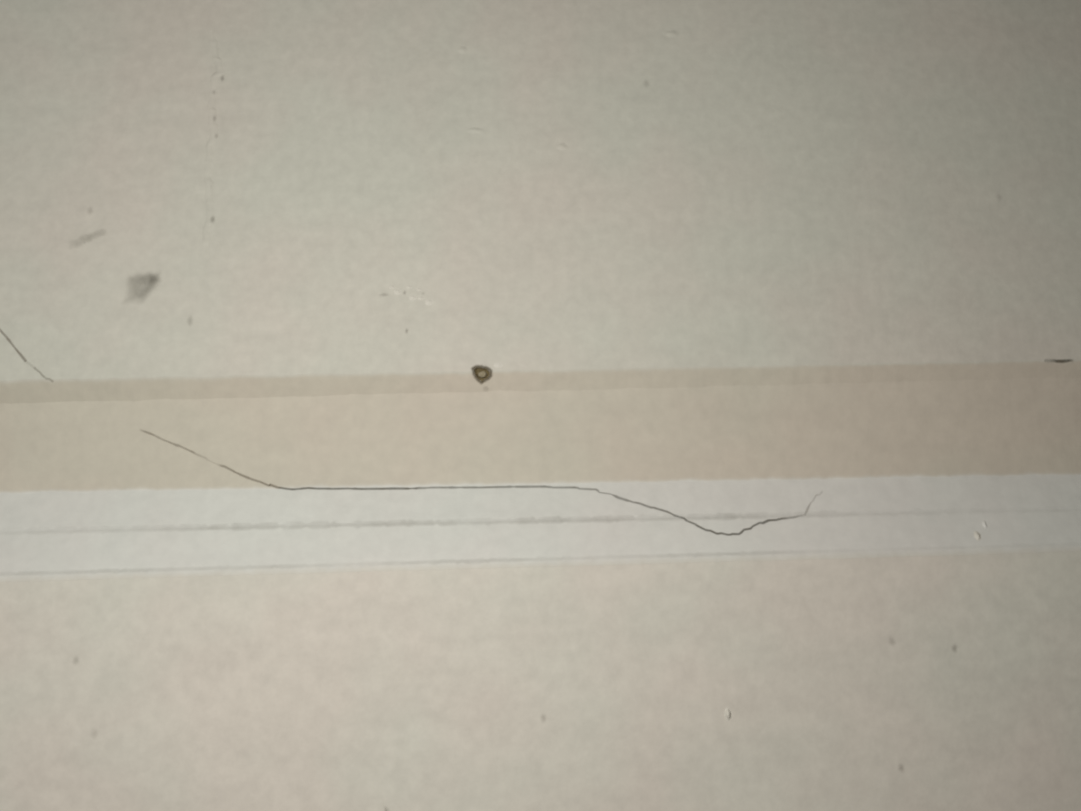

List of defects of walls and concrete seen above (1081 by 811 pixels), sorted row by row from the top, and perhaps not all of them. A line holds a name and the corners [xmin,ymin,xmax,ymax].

crack [278,484,418,492]
crack [696,518,784,535]